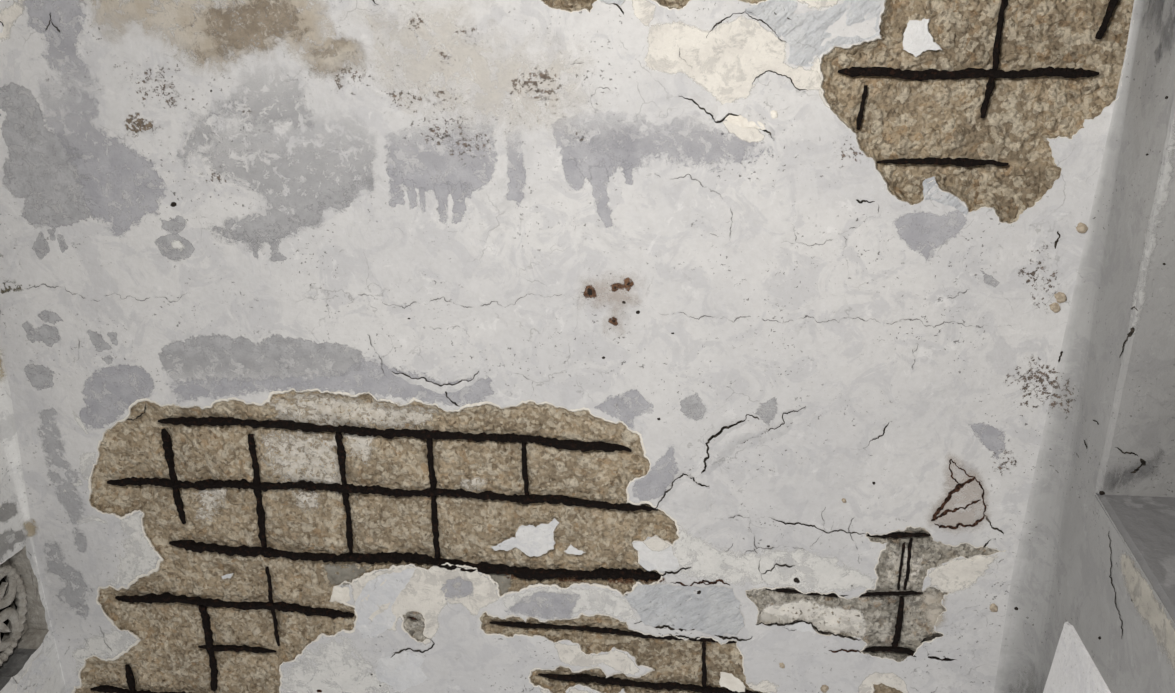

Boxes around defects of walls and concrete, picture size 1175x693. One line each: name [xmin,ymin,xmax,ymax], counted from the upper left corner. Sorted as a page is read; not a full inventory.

damp [125,113,157,137]
damp [126,61,194,108]
damp [93,0,371,95]
spalling [540,0,625,13]
spalling [592,0,1134,260]
damp [556,131,636,228]
crack [367,334,480,406]
crack [656,406,806,509]
spalling [39,330,1006,693]
crack [931,459,1004,561]
crack [1108,533,1123,639]